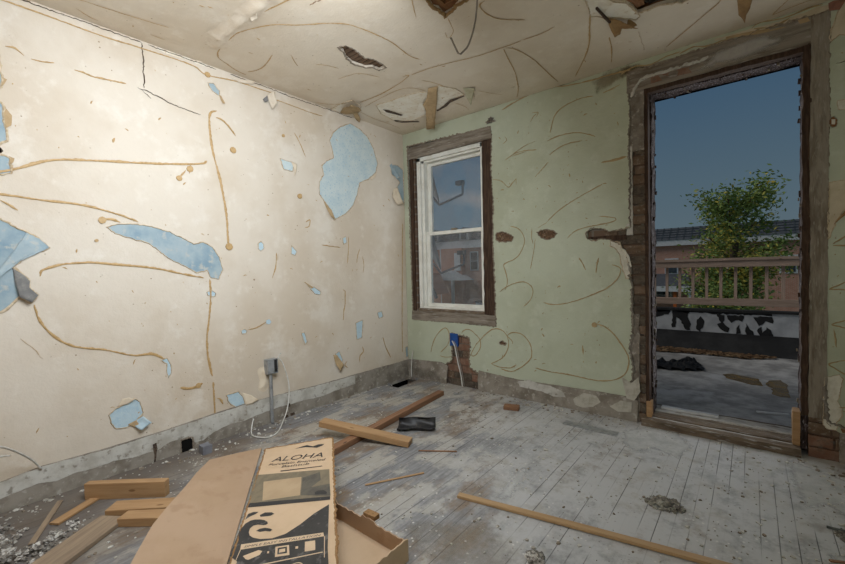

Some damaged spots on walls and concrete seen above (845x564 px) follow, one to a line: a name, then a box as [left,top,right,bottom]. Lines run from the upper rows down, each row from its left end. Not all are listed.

crack [23,0,352,118]
flaking render [337,45,387,71]
peeling [584,0,641,37]
peeling [0,100,15,176]
peeling [319,100,378,220]
peeling [0,218,50,314]
peeling [106,223,223,279]
peeling [376,85,514,374]
flaking render [536,229,558,240]
flaking render [585,77,640,412]
peeling [0,351,355,499]
peeling [822,374,845,433]